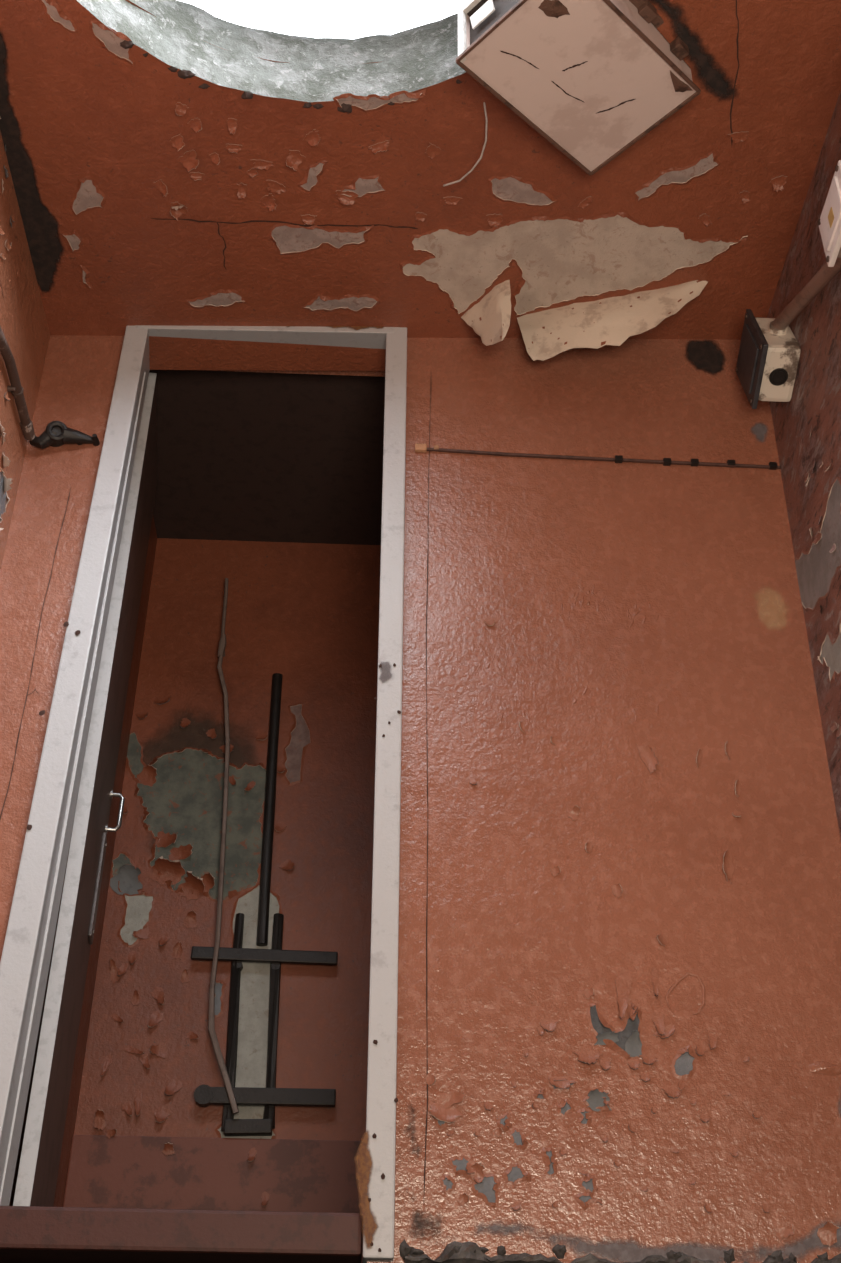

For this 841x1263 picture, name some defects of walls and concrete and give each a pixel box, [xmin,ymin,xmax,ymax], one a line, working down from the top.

peeling [60,177,106,290]
peeling [237,129,374,255]
peeling [301,294,380,312]
peeling [399,175,748,361]
peeling [633,151,720,202]
peeling [794,460,841,614]
peeling [817,624,841,684]
peeling [110,695,312,1088]
peeling [583,970,642,1060]
peeling [215,1105,278,1162]
peeling [440,1102,568,1211]
spalling [399,1221,841,1263]